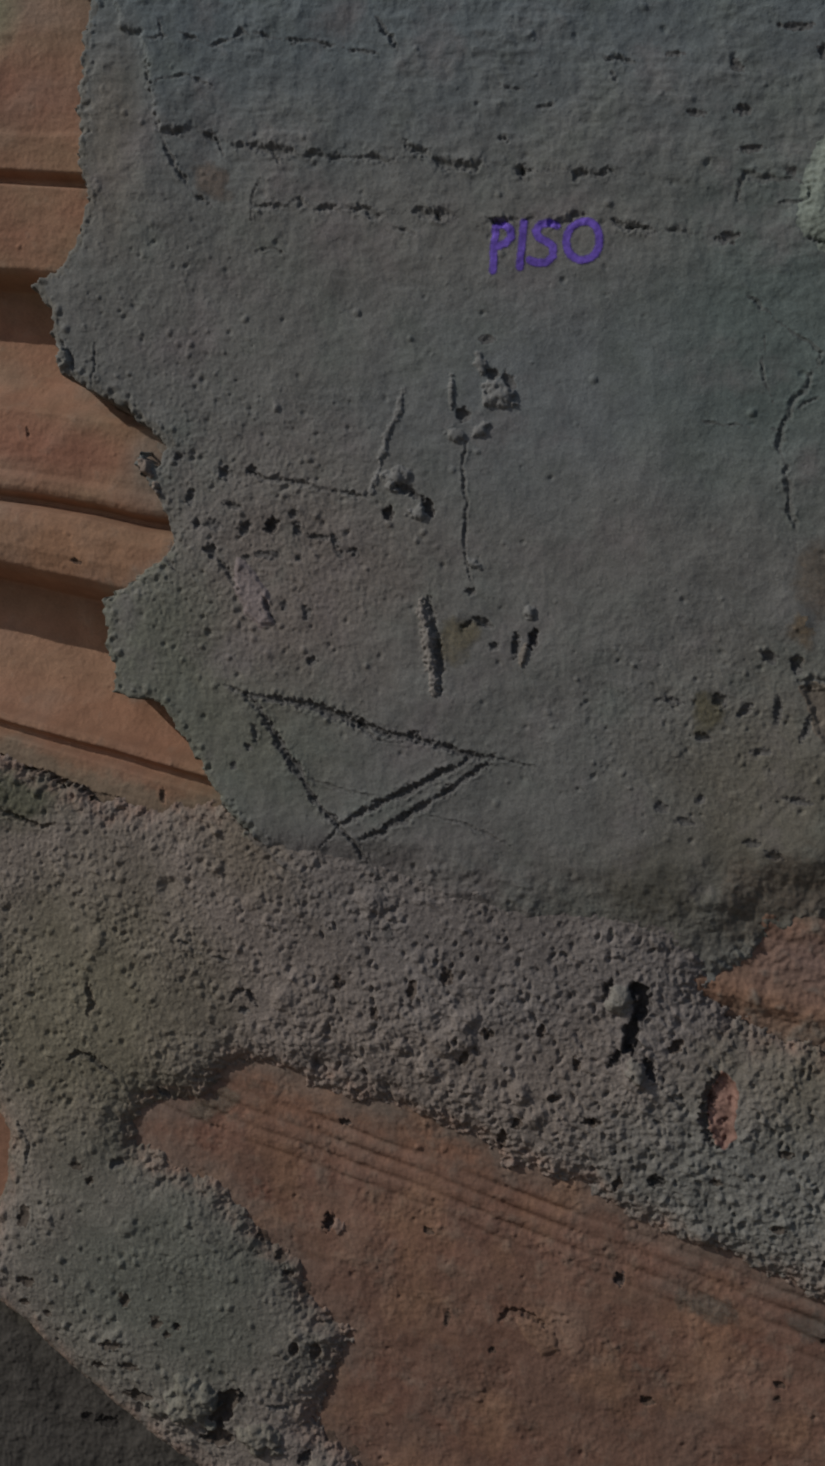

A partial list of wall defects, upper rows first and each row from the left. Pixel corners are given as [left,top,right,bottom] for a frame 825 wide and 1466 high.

crack [144,16,693,257]
spalling [31,0,98,347]
crack [734,167,809,205]
spalling [59,363,184,505]
spalling [184,487,359,563]
spalling [497,1116,524,1148]
spalling [580,1117,602,1128]
spalling [697,1071,739,1150]
spalling [647,1174,666,1189]
spalling [322,1211,345,1235]
spalling [92,1339,154,1403]
spalling [288,1342,322,1360]